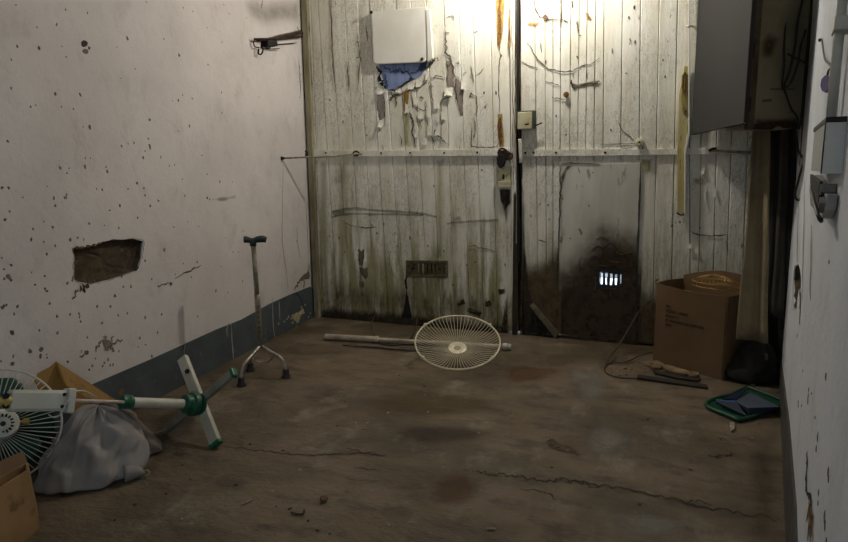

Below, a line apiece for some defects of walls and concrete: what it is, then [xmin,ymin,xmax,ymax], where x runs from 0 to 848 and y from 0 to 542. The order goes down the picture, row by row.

peeling [375,58,436,131]
peeling [444,31,471,116]
corrosion [496,0,517,177]
flaking render [66,236,146,299]
damp [322,189,541,335]
crack [232,447,385,471]
crack [465,468,782,522]